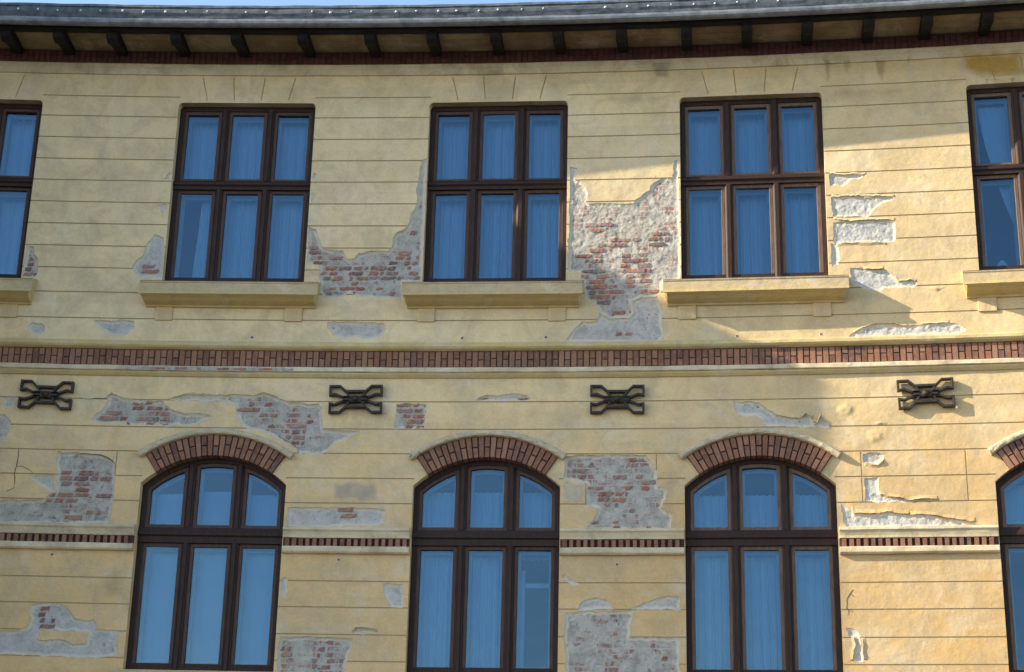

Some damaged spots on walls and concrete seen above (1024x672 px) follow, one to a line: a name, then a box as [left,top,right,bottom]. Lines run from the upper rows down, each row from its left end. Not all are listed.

spalling [132,234,165,278]
spalling [307,158,428,300]
spalling [566,160,681,342]
spalling [829,172,896,266]
spalling [849,320,966,337]
spalling [83,391,359,455]
spalling [394,403,427,429]
spalling [0,452,115,524]
spalling [563,454,672,528]
spalling [841,452,980,527]
peeling [0,602,119,658]
spalling [564,596,681,672]